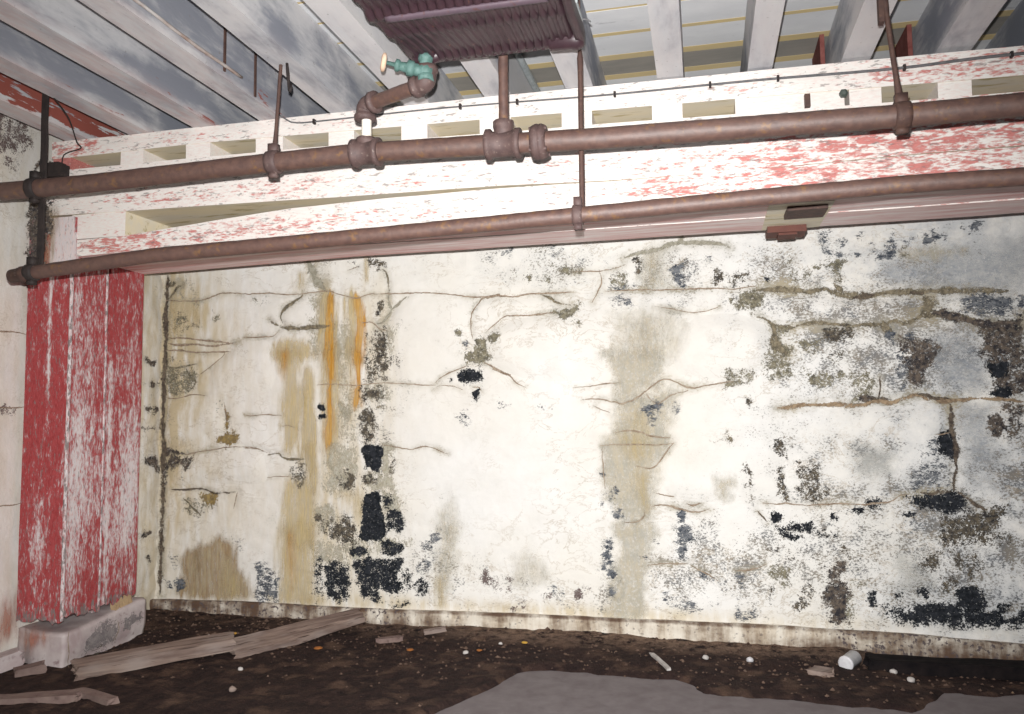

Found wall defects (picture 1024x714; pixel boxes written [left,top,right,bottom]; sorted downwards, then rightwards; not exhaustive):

mould [289,459,308,489]
corrosion [273,290,366,604]
damp [311,300,453,609]
crack [157,236,1024,594]
damp [599,228,1024,632]